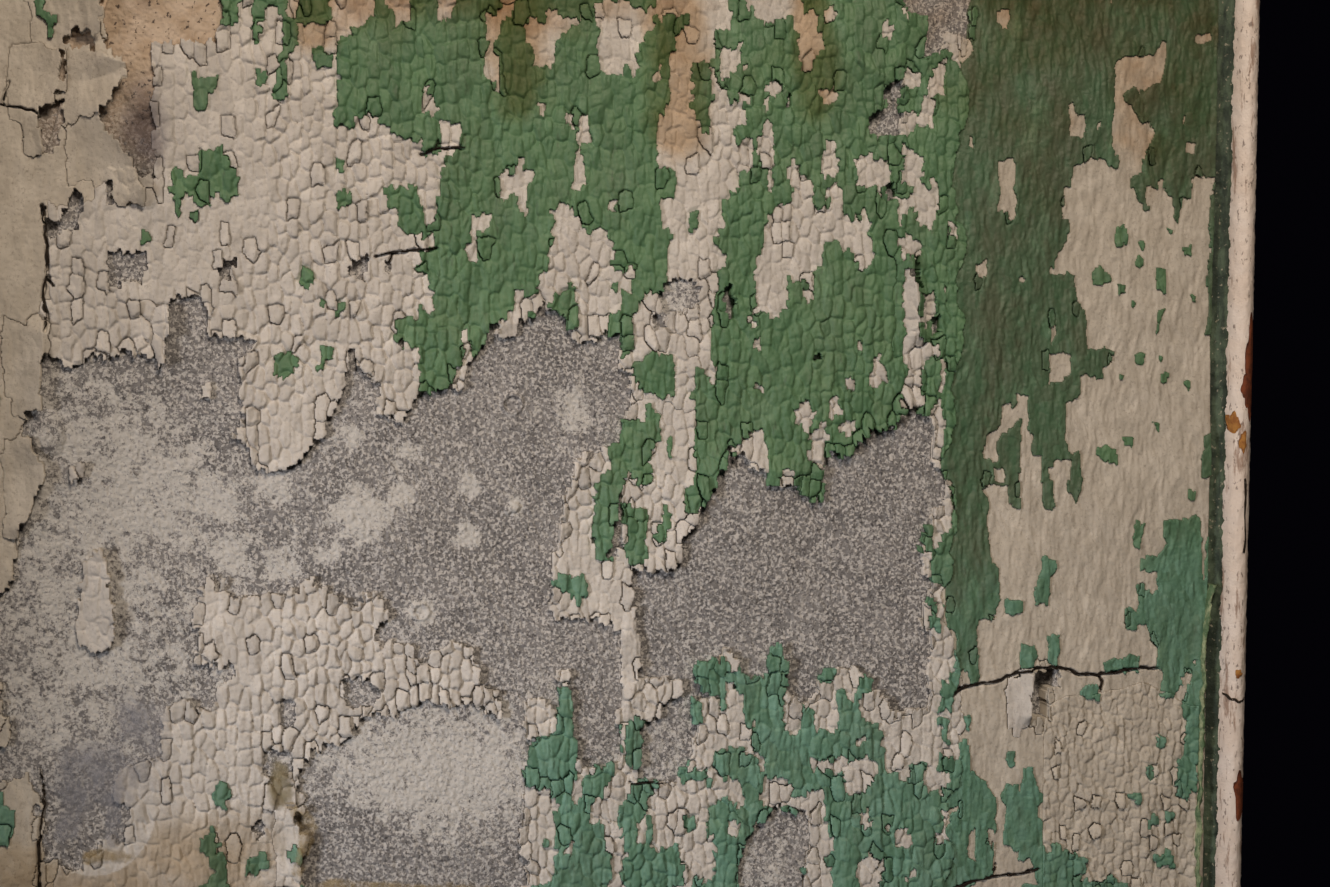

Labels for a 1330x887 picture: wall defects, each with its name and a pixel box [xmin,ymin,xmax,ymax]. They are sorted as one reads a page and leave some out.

peeling [823,6,838,24]
spalling [59,50,67,81]
peeling [719,42,743,81]
spalling [39,99,65,154]
peeling [168,144,240,218]
peeling [548,402,697,824]
crack [954,665,1157,694]
peeling [53,573,484,887]
spalling [262,672,629,887]
crack [37,769,46,887]